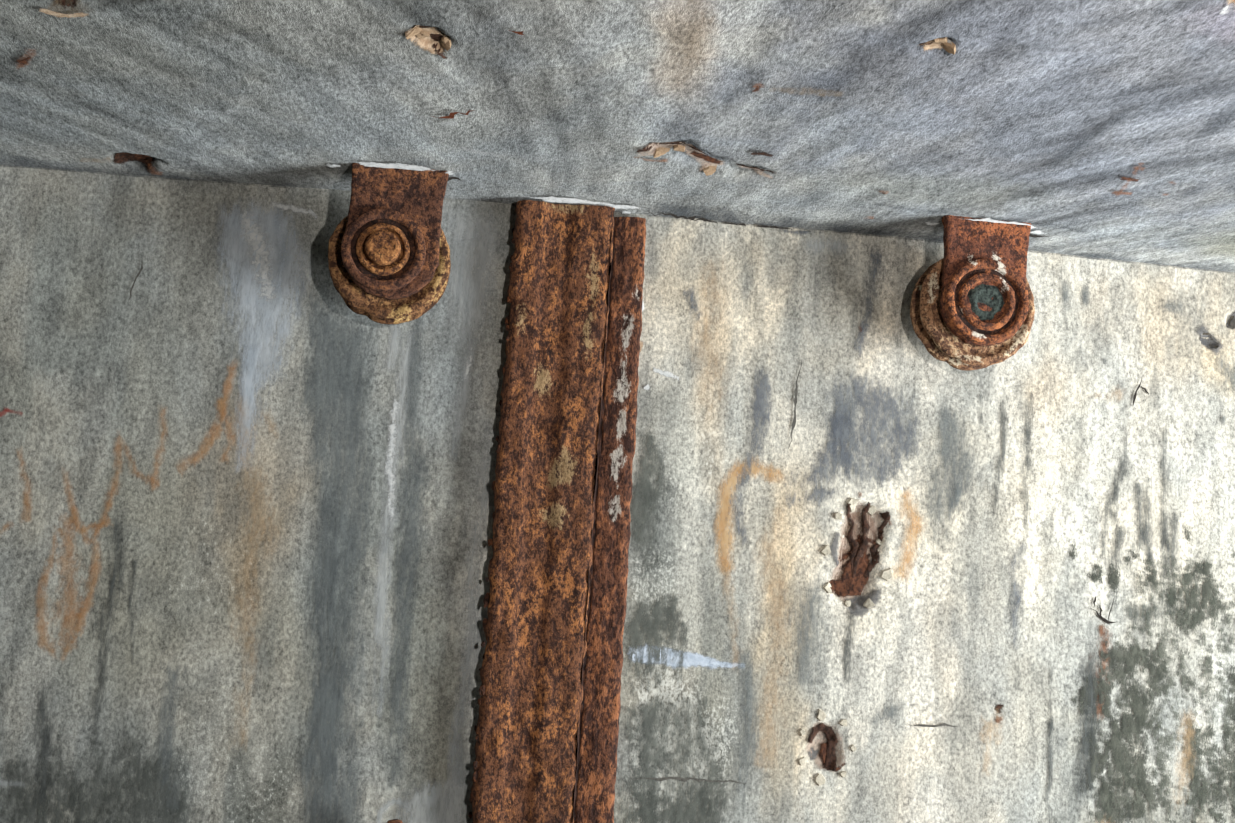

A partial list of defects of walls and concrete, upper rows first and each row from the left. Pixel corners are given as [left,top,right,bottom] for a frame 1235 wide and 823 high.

spalling [405,25,452,59]
spalling [920,37,956,55]
spalling [635,141,775,177]
rust [479,512,495,671]
leakage [1066,439,1235,823]
leakage [621,595,727,823]
leakage [710,660,755,748]